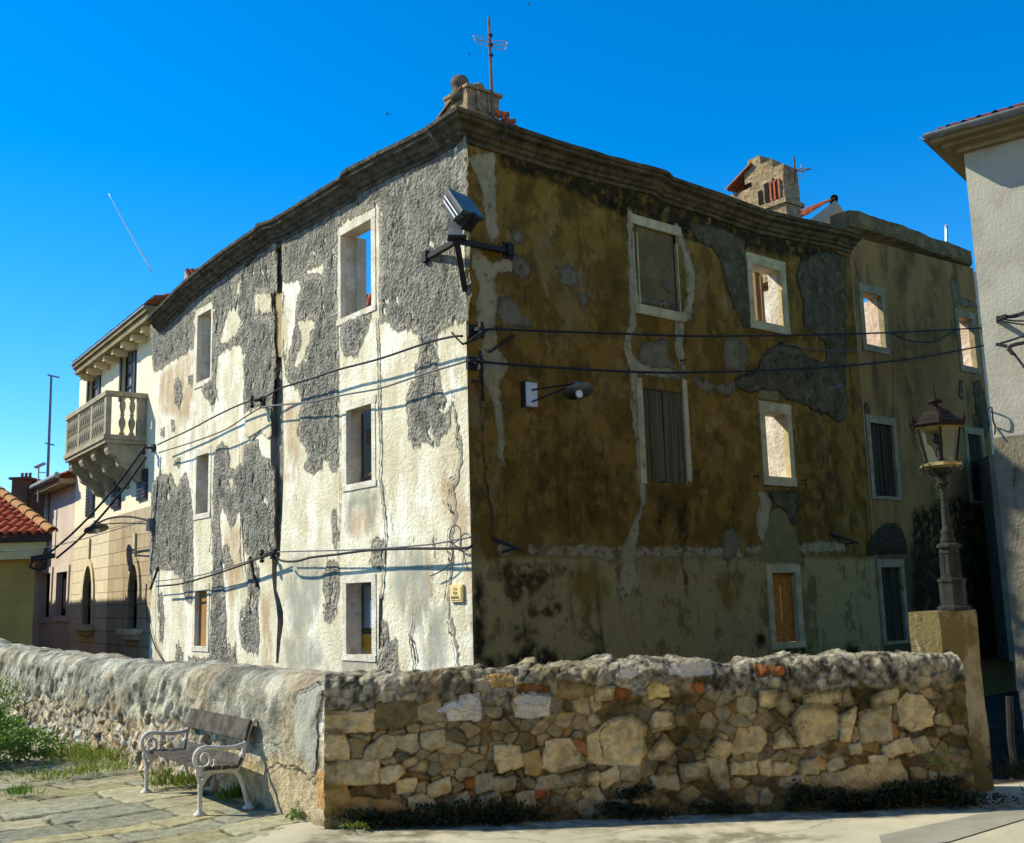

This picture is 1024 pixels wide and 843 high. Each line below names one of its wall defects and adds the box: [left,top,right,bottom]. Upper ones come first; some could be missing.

peeling [150,135,472,476]
spalling [497,295,535,329]
spalling [690,221,750,328]
spalling [692,250,847,423]
peeling [157,592,165,644]
peeling [149,457,194,604]
peeling [175,438,276,663]
peeling [322,509,340,623]
crack [408,376,494,670]